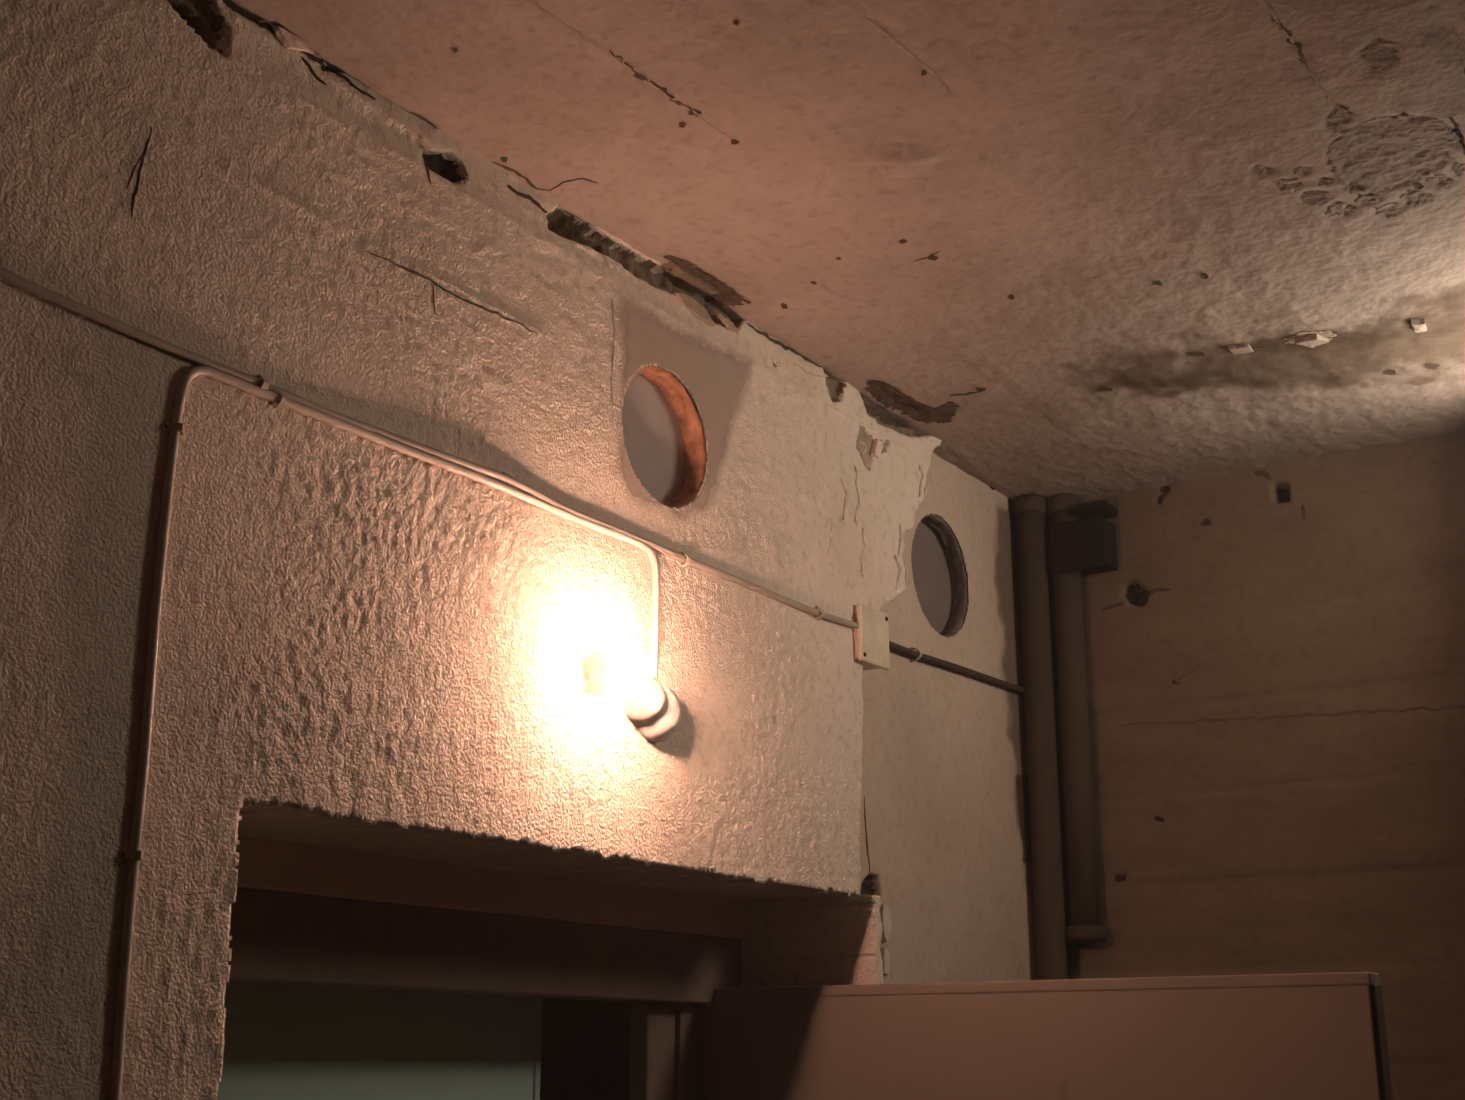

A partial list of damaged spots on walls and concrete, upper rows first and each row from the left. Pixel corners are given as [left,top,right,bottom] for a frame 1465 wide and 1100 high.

spalling [168,0,227,57]
crack [530,0,739,145]
crack [1259,0,1330,105]
spalling [1359,39,1398,73]
spalling [419,138,466,185]
spalling [1253,105,1465,219]
spalling [507,184,986,579]
leakage [1108,293,1465,389]